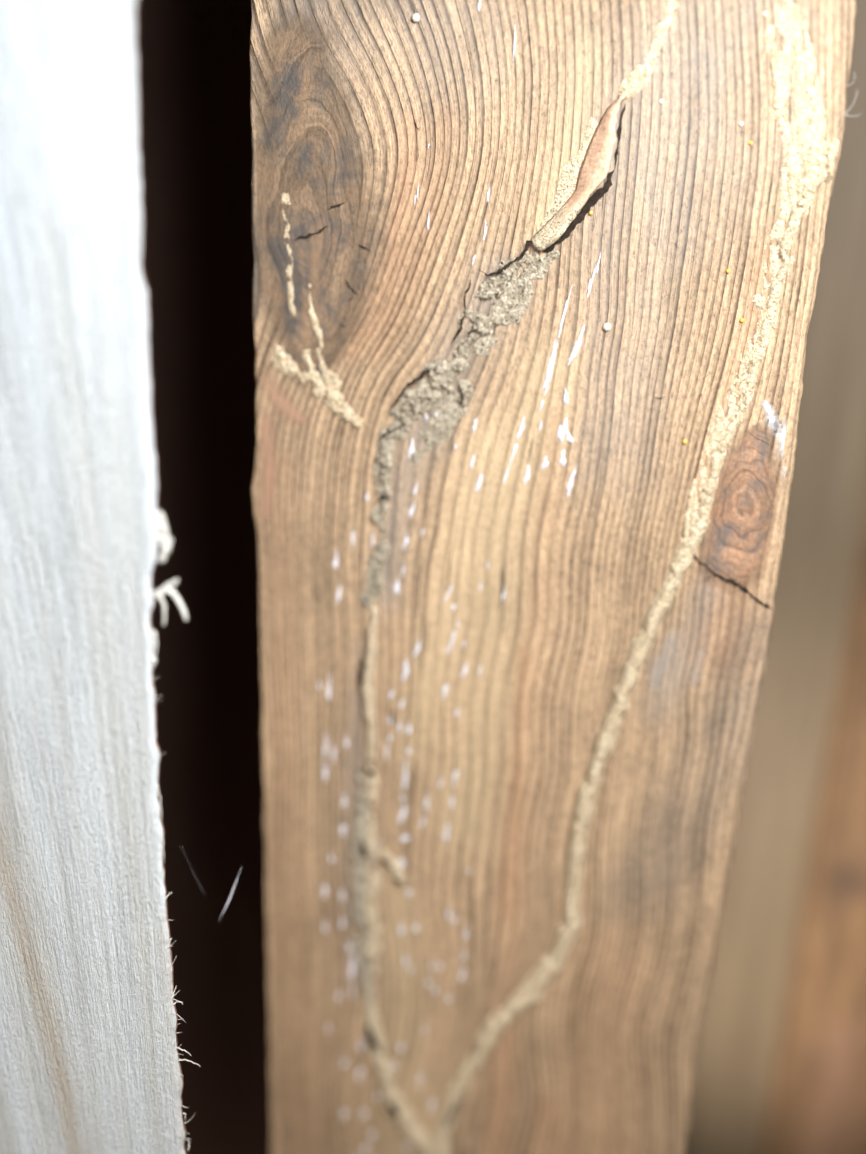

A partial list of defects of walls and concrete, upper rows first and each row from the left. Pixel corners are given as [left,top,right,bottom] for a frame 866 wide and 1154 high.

crack [378,240,533,440]
crack [693,554,771,609]